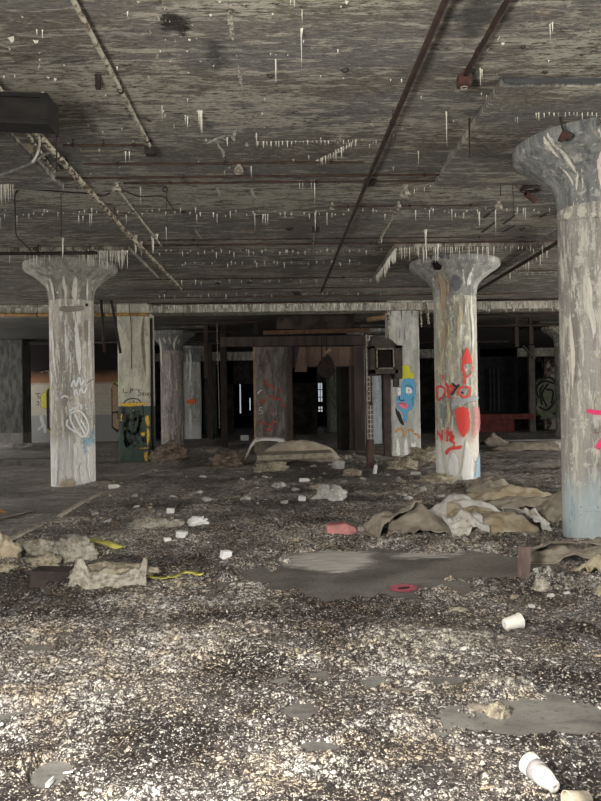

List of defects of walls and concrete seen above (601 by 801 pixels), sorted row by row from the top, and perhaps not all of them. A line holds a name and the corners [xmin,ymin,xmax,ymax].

peeling [564,205,601,220]
water stain [451,267,474,291]